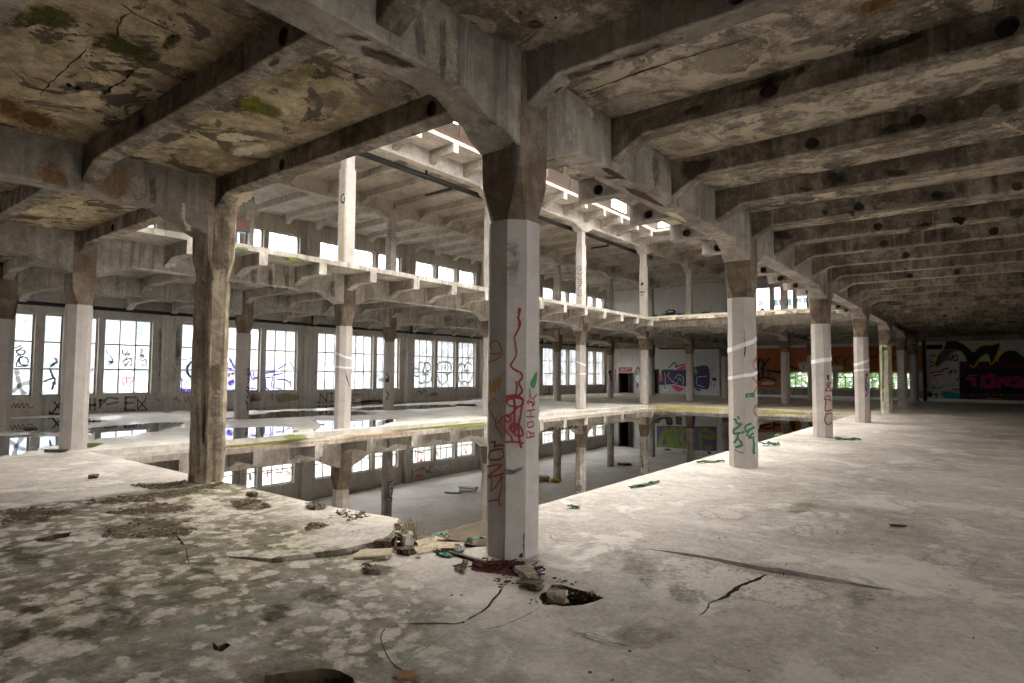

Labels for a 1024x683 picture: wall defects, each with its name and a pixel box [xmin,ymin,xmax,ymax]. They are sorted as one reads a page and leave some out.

crack [35,48,87,96]
crack [103,2,177,94]
crack [698,564,787,616]